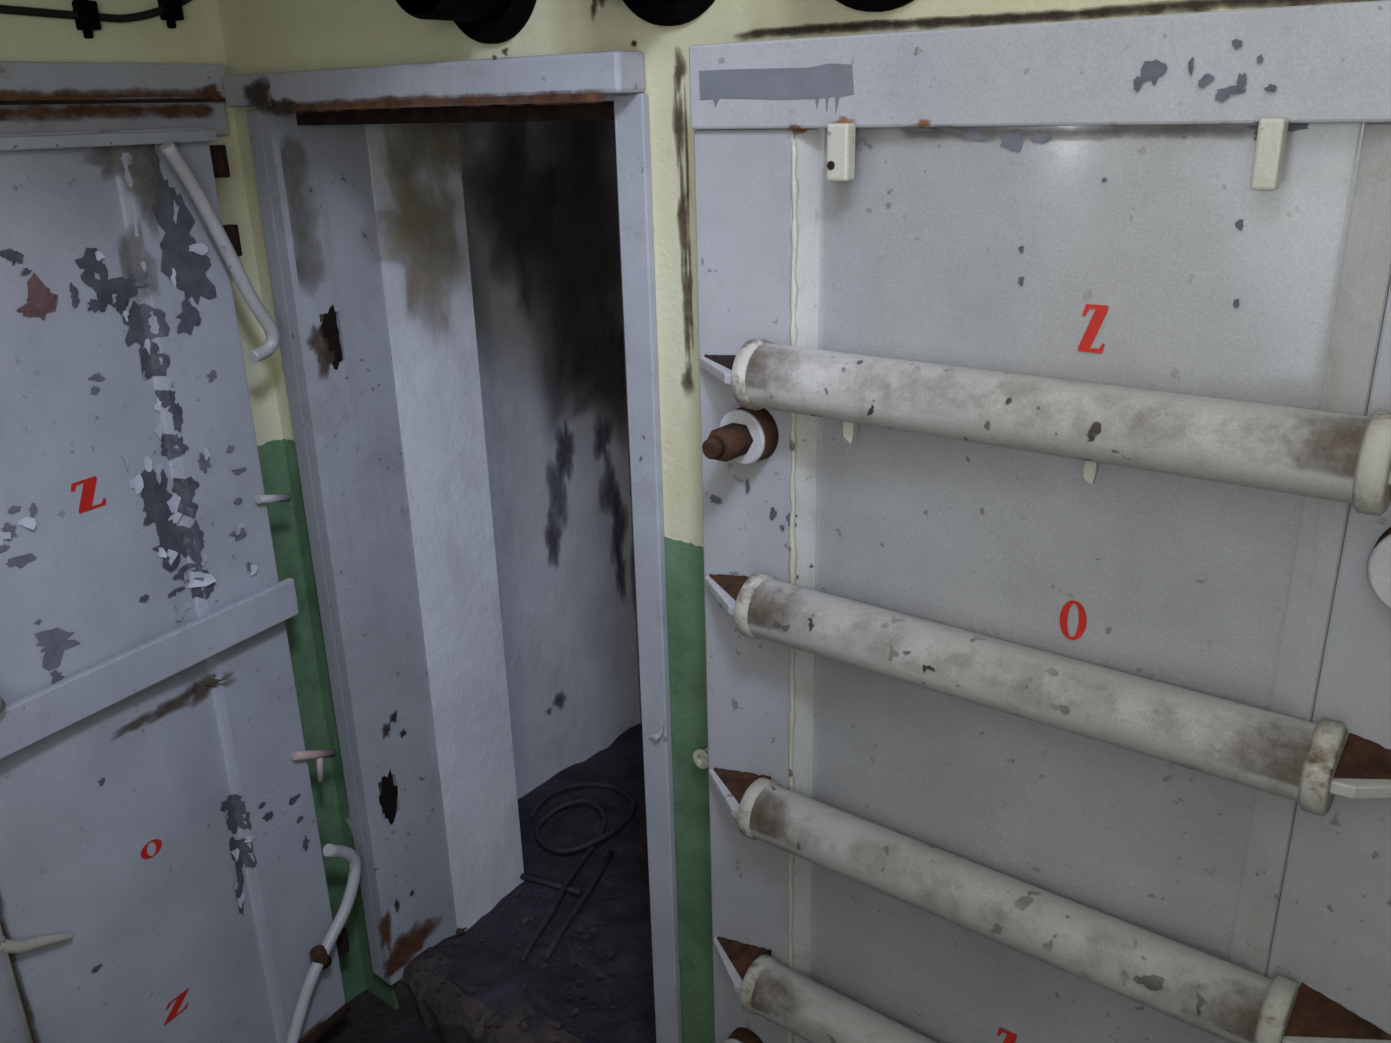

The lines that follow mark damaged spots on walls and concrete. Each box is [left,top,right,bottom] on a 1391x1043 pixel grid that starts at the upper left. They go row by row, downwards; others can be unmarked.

corrosion [0,84,222,120]
corrosion [94,145,149,177]
corrosion [674,88,736,389]
peeling [0,144,217,621]
peeling [229,523,247,540]
damp [547,426,572,562]
damp [596,422,635,591]
corrosion [118,675,229,736]
corrosion [378,914,436,976]